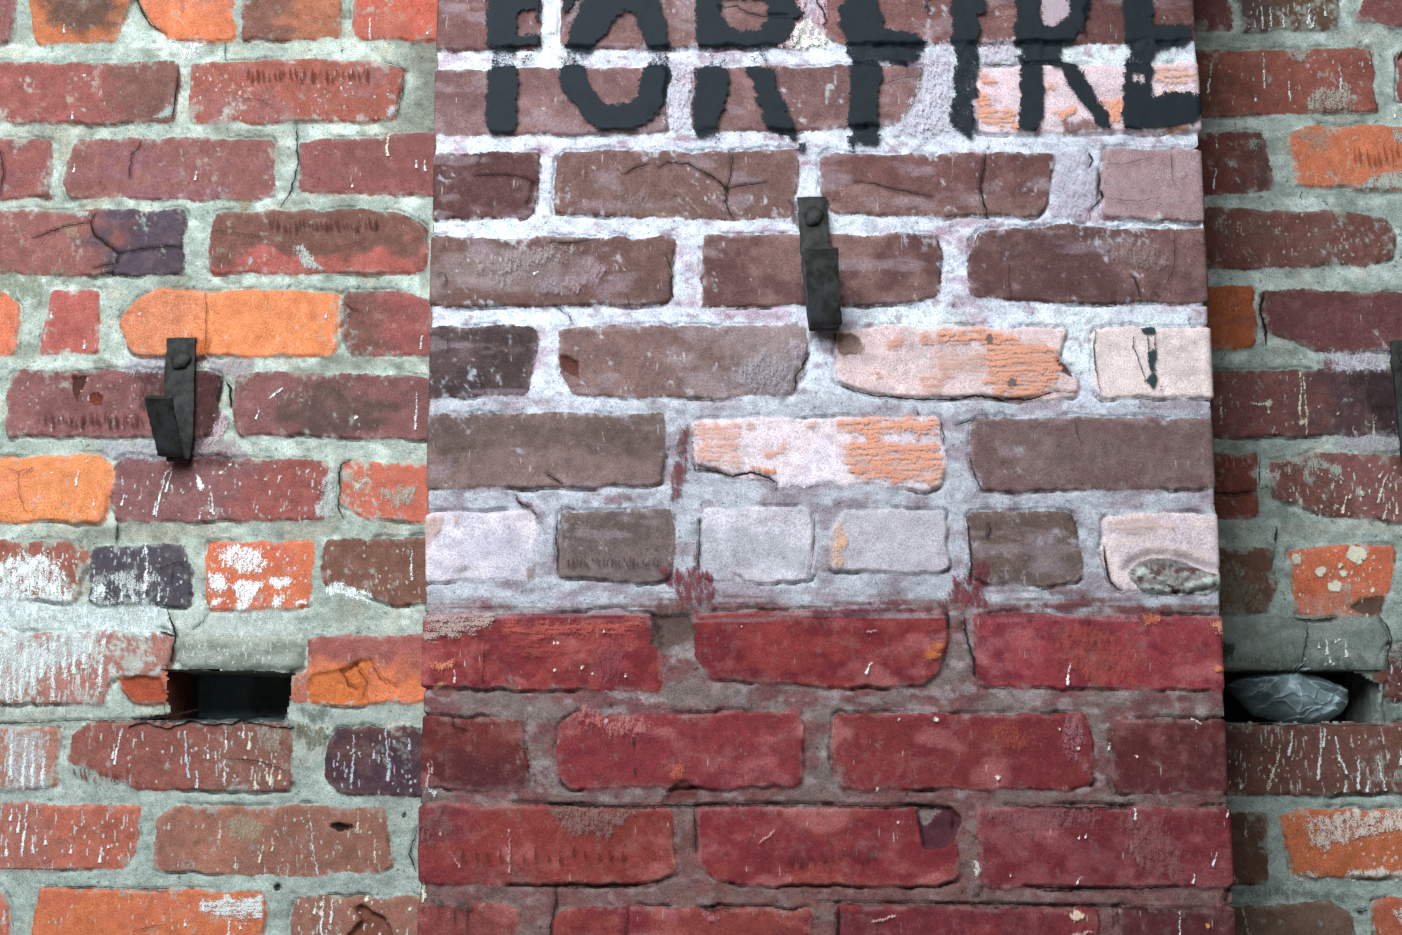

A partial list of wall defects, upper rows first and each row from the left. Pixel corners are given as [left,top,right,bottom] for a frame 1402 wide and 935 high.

crack [627,155,766,219]
crack [32,213,182,275]
spalling [118,659,373,728]
crack [340,662,396,699]
hole [1221,669,1384,726]